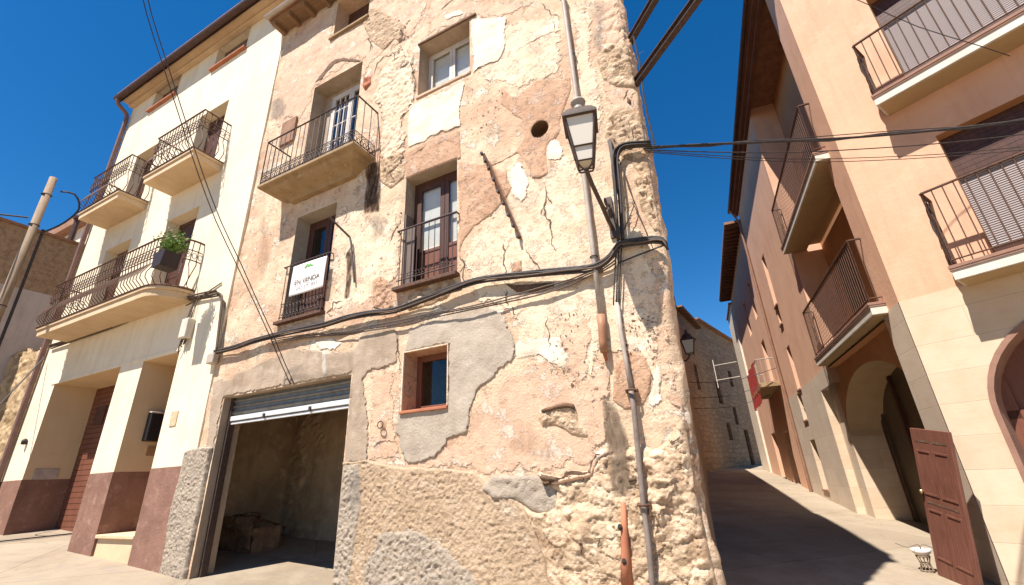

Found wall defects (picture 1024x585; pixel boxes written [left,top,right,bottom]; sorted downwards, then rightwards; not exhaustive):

spalling [597,44,635,88]
peeling [380,77,571,251]
crack [502,181,555,313]
spalling [526,315,717,585]